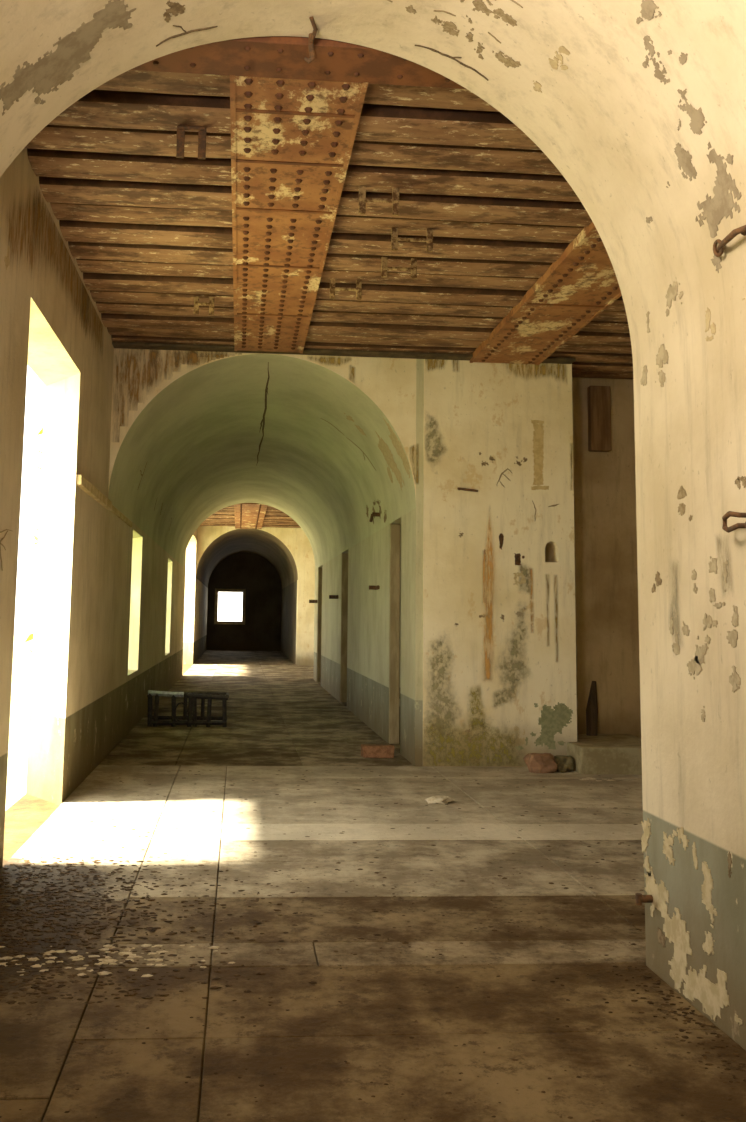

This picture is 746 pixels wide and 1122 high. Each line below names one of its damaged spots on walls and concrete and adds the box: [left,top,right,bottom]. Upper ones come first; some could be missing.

flaking render [0,0,136,116]
spalling [431,0,521,68]
flaking render [642,36,742,273]
water stain [8,200,103,349]
crack [256,362,269,466]
water stain [411,418,443,483]
crack [0,529,12,571]
water stain [431,641,454,730]
corrosion [483,527,493,679]
water stain [495,609,525,705]
flaking render [669,556,739,679]
peeling [641,818,743,1026]